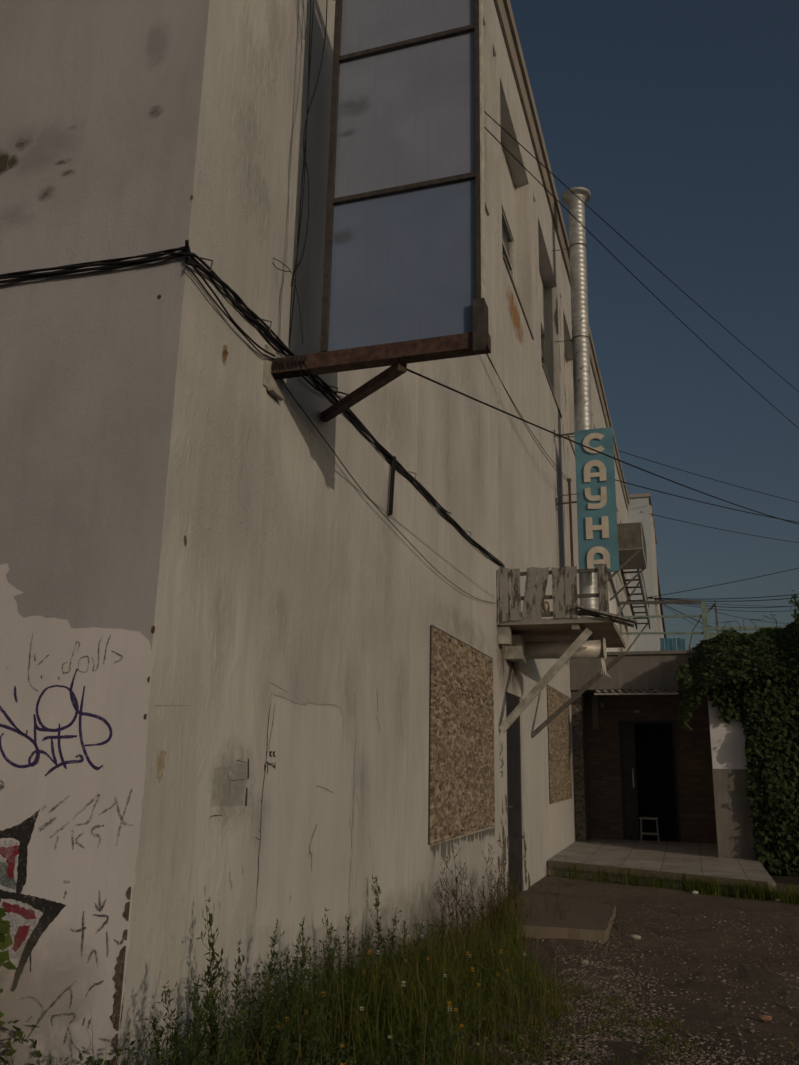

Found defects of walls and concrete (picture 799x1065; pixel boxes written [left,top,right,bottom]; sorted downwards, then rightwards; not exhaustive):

water stain [0,142,24,172]
spalling [110,887,131,1065]